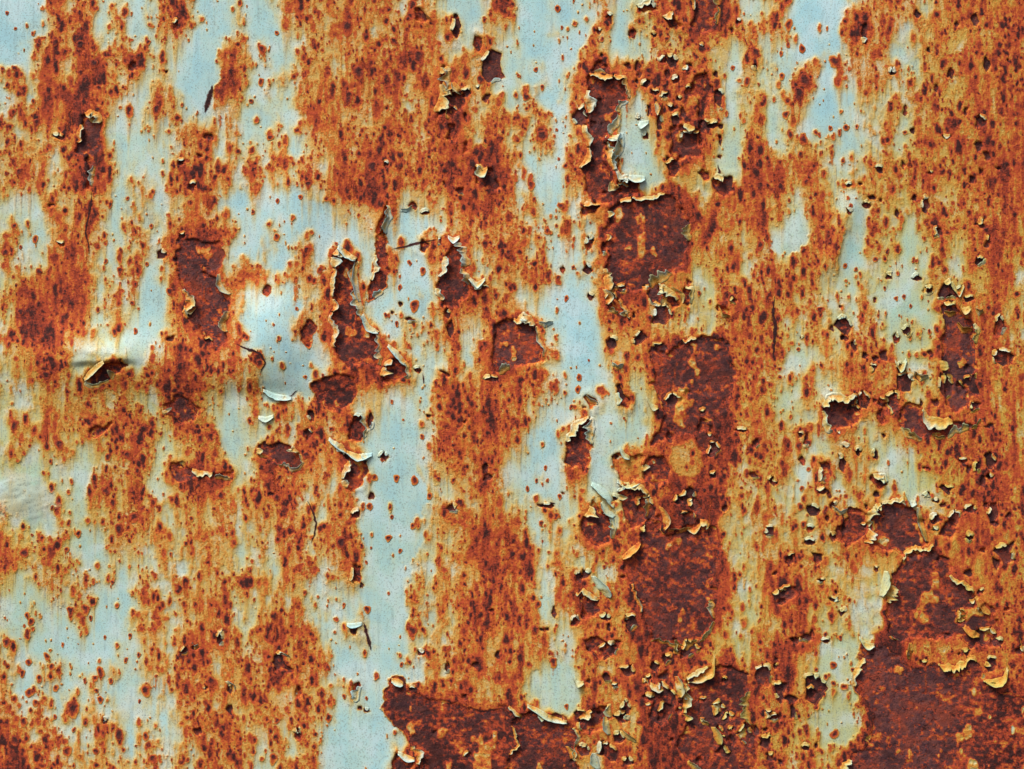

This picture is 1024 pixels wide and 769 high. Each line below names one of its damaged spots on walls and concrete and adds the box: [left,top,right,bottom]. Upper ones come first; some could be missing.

peeling [157,230,232,350]
corrosion [0,0,562,769]
peeling [300,202,430,499]
peeling [420,235,489,338]
peeling [482,312,553,382]
peeling [382,331,830,769]
peeling [571,53,724,325]
peeling [699,170,733,195]
corrosion [546,0,1024,769]
peeling [846,195,882,215]
peeling [804,272,1024,769]
peeling [912,193,930,213]